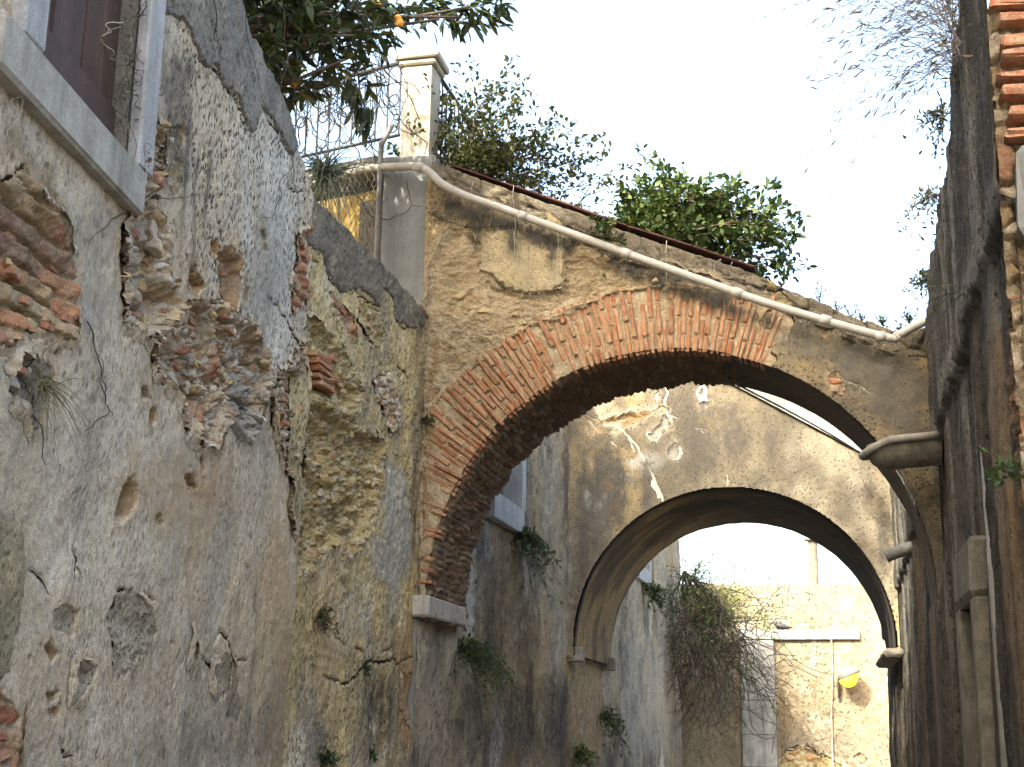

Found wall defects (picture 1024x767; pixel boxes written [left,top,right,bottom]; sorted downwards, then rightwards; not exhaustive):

spalling [0,164,83,443]
flaking render [119,114,731,588]
spalling [114,477,135,525]
spalling [53,605,76,636]
spalling [67,645,96,711]
spalling [107,586,156,679]
spalling [185,619,240,723]
crack [325,637,411,685]